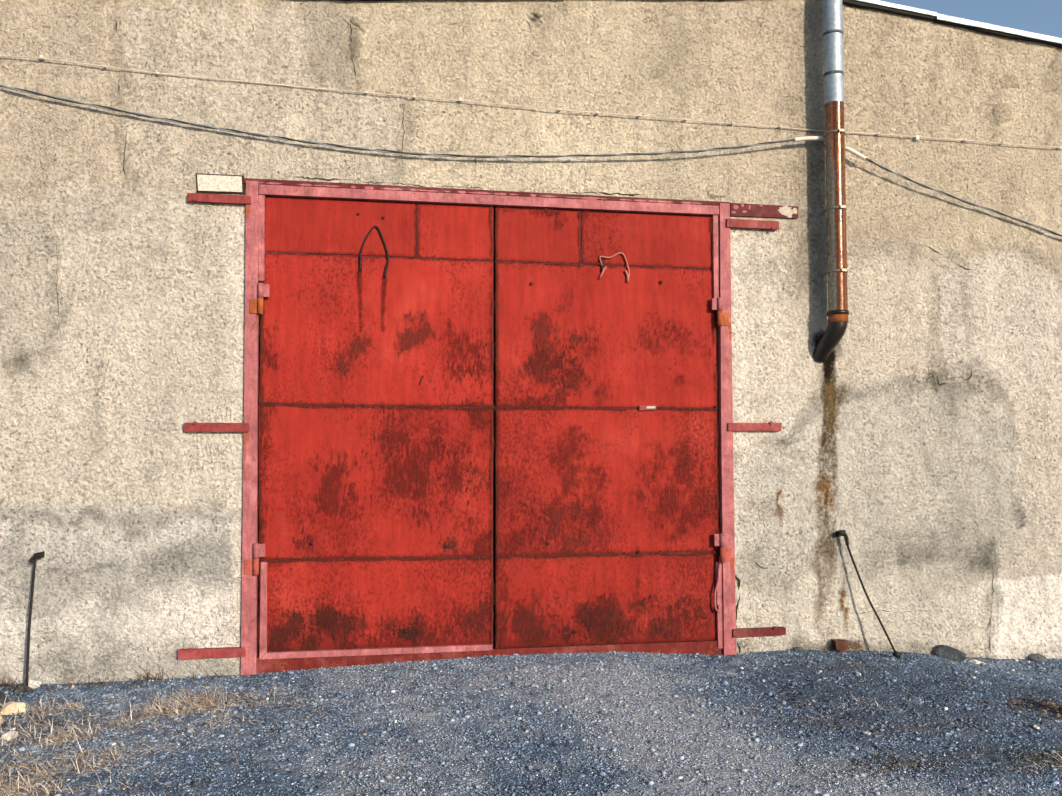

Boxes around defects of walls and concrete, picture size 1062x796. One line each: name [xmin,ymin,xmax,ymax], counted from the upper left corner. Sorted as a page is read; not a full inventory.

corrosion [825,101,848,311]
corrosion [243,206,734,652]
corrosion [817,351,845,568]